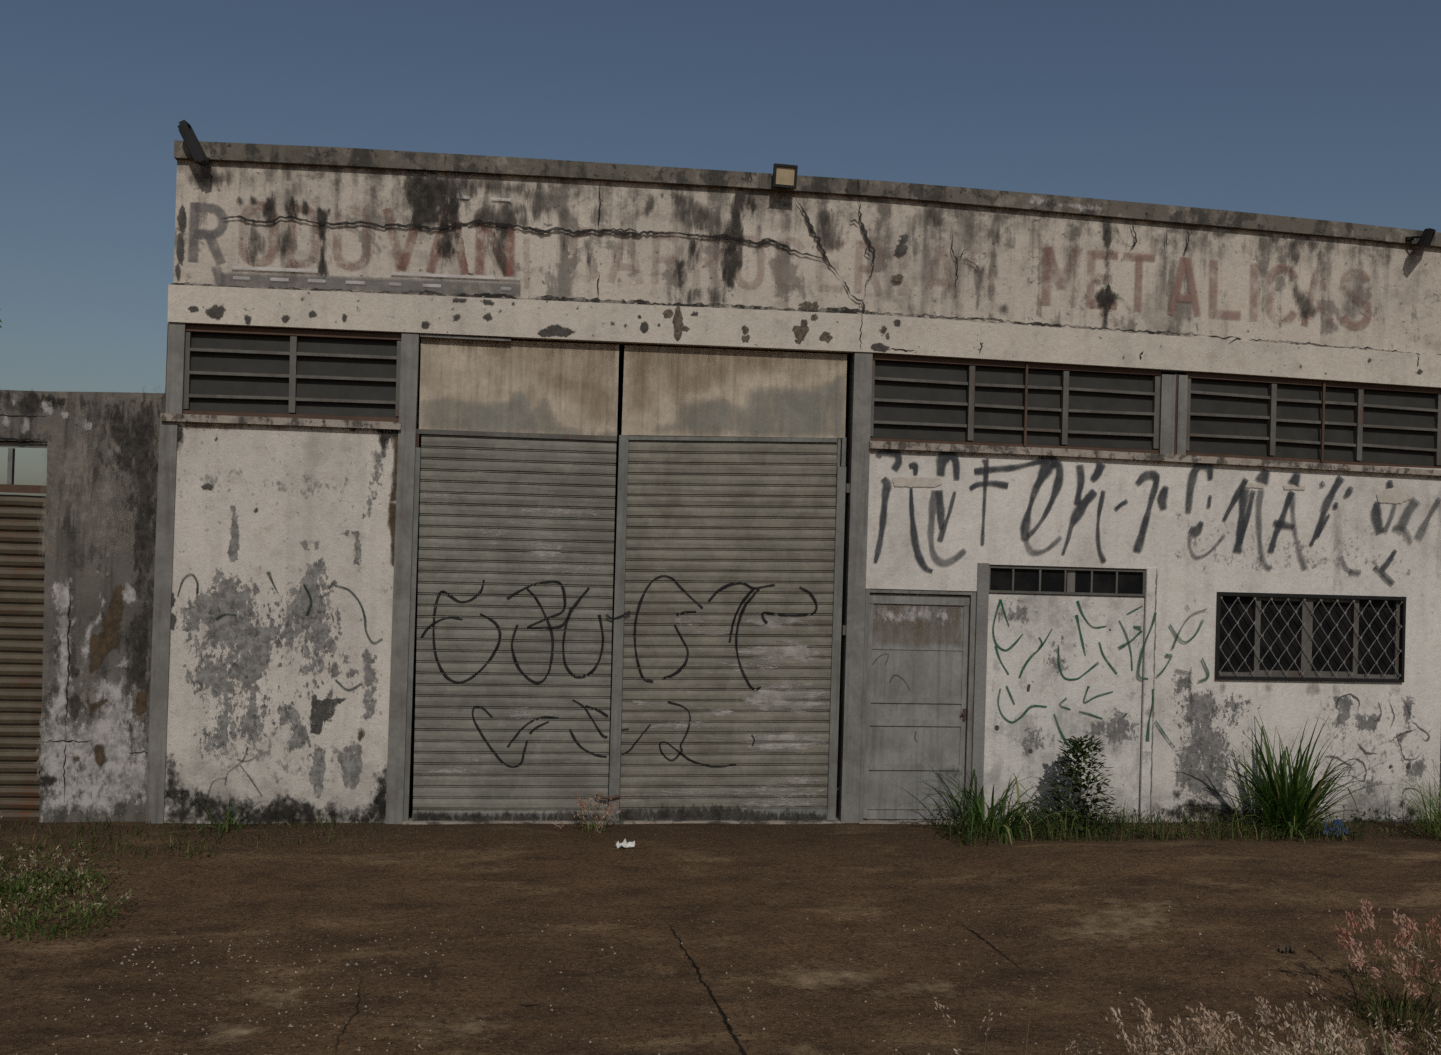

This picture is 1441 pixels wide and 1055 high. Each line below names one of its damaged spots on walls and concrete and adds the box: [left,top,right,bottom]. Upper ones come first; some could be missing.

damp [238,195,330,276]
damp [399,170,549,273]
spalling [611,309,698,333]
damp [672,188,757,341]
crack [172,179,1441,367]
spalling [792,301,833,344]
damp [1096,217,1118,326]
damp [0,391,163,692]
peeling [171,505,378,799]
peeling [1165,675,1260,801]
peeling [1324,695,1427,800]
crack [670,925,747,1055]